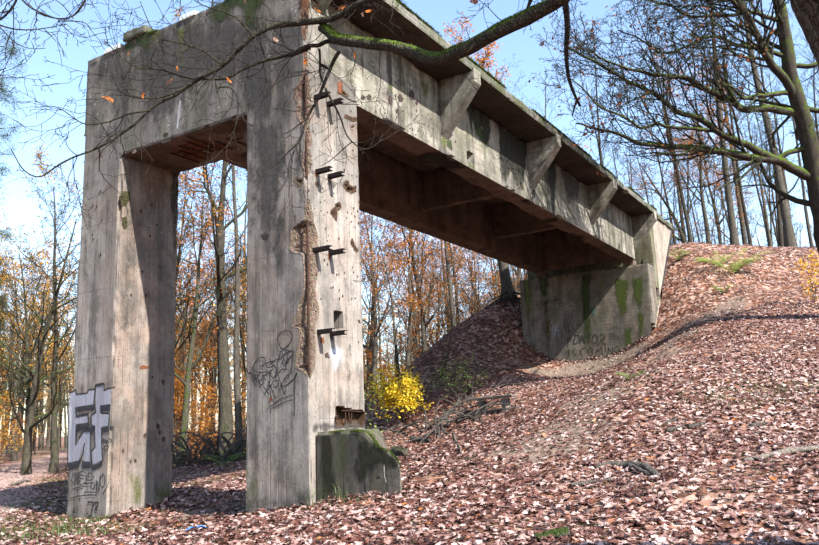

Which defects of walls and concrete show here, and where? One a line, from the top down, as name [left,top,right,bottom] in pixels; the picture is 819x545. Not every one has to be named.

damp [467,103,535,204]
spalling [289,51,360,376]
damp [314,423,372,493]